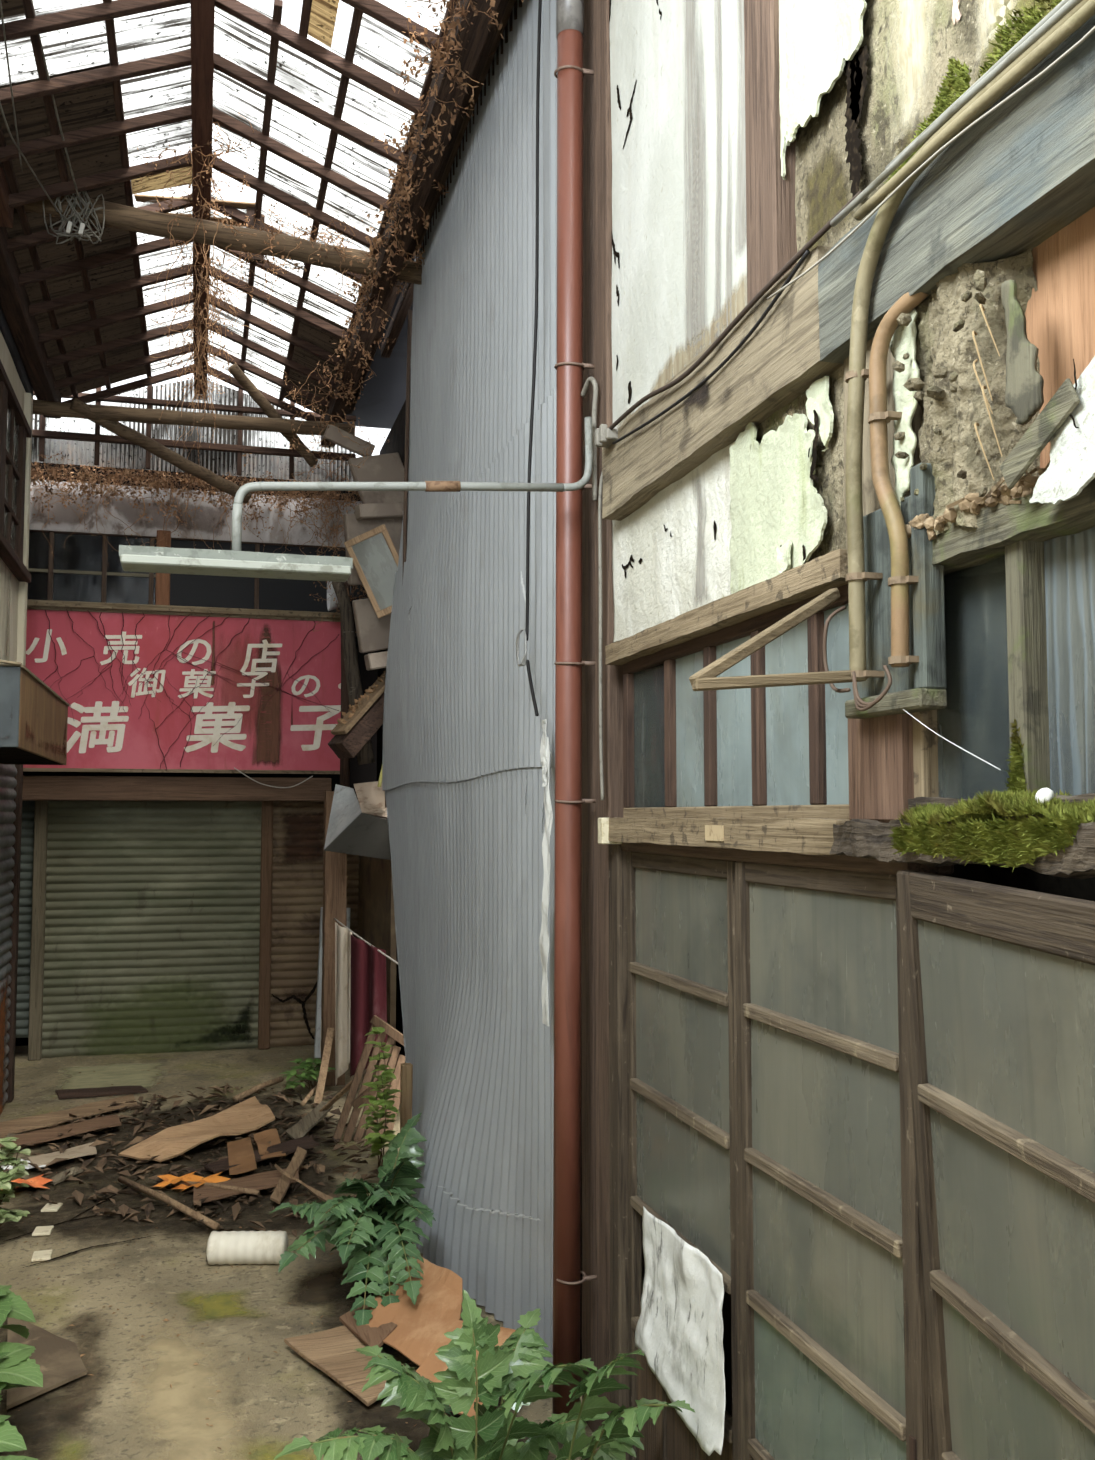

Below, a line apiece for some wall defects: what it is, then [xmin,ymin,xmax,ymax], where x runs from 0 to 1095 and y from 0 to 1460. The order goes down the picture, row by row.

peeling [779,0,867,180]
crack [844,44,869,198]
damp [893,0,928,170]
spalling [952,0,961,24]
damp [980,0,1014,48]
peeling [729,376,834,594]